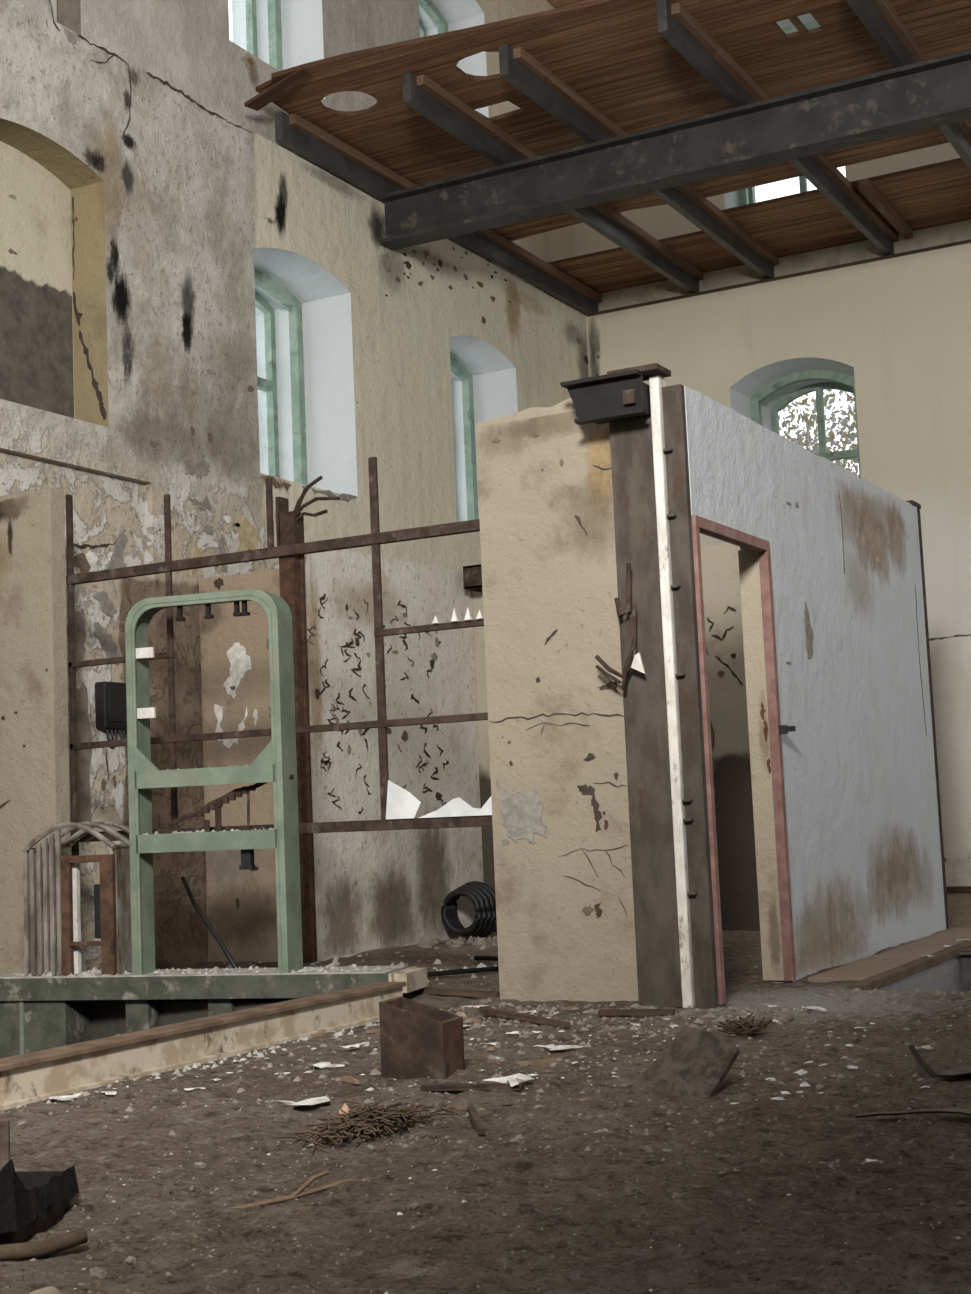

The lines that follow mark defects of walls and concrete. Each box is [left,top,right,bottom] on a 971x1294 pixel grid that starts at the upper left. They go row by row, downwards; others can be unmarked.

crack [46,0,252,138]
crack [72,197,106,420]
spalling [374,218,511,303]
spalling [183,457,210,479]
peeling [190,494,258,590]
crack [838,493,846,574]
peeling [214,642,258,749]
peeling [307,594,328,646]
peeling [315,598,449,814]
crack [489,712,624,735]
crack [915,586,971,735]